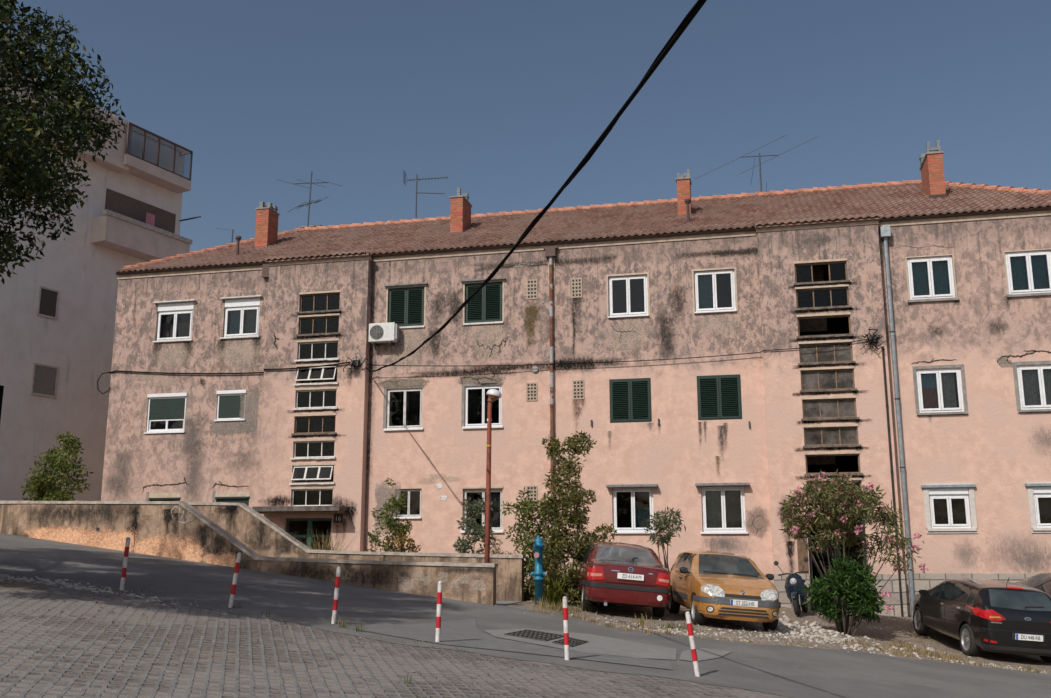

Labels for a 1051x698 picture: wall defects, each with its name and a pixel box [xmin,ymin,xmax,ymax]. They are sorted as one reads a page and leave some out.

crack [997,350,1051,365]
leakage [164,509,178,531]
crack [133,477,242,553]
leakage [200,526,246,567]
leakage [255,522,296,553]